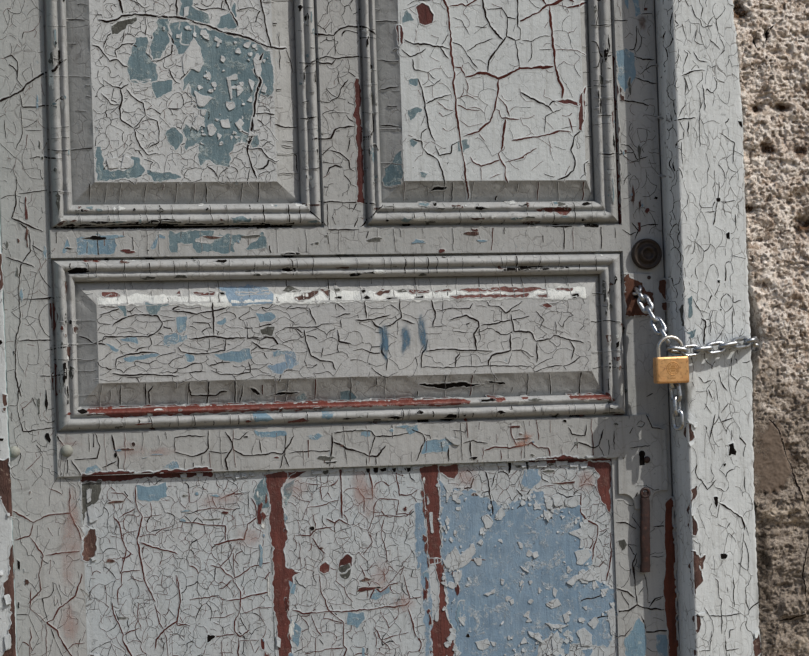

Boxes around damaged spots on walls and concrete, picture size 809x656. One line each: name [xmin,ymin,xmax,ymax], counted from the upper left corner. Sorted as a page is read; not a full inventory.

peeling [93,144,183,184]
peeling [54,190,269,296]
peeling [125,0,275,169]
peeling [36,313,507,440]
crack [0,0,624,656]
peeling [95,269,588,364]
crack [585,0,759,656]
peeling [0,456,12,518]
peeling [0,541,30,656]
peeling [79,424,707,656]
crack [438,403,667,656]
crack [756,417,809,622]